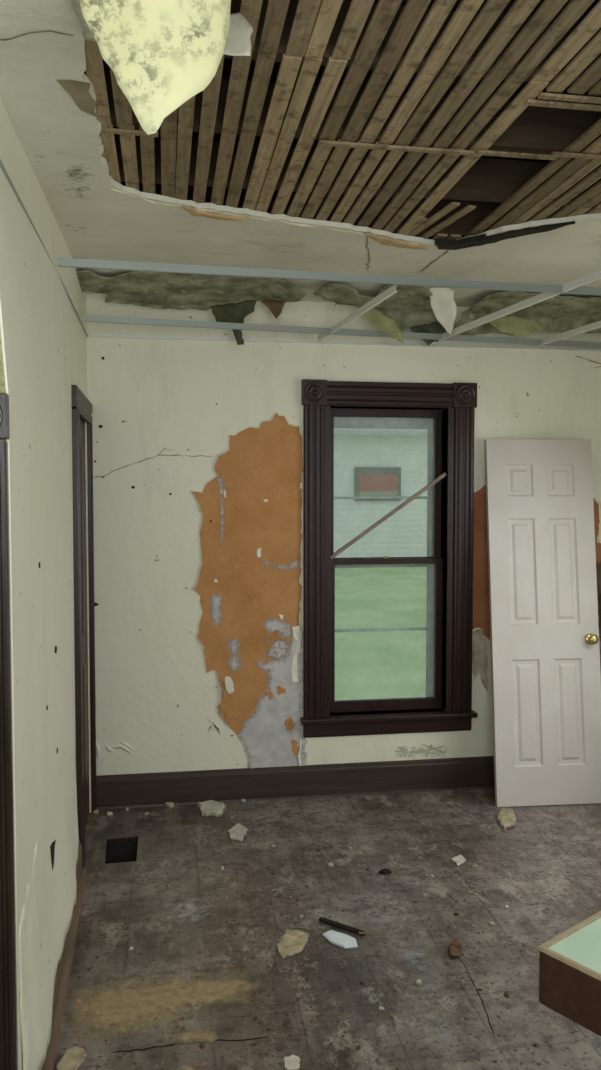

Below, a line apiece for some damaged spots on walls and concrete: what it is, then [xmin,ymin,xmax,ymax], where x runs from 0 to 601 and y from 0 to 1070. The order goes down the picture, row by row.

flaking render [183,204,246,221]
flaking render [366,232,429,250]
crack [93,448,212,479]
flaking render [593,498,601,564]
flaking render [189,411,307,768]
flaking render [472,484,490,694]